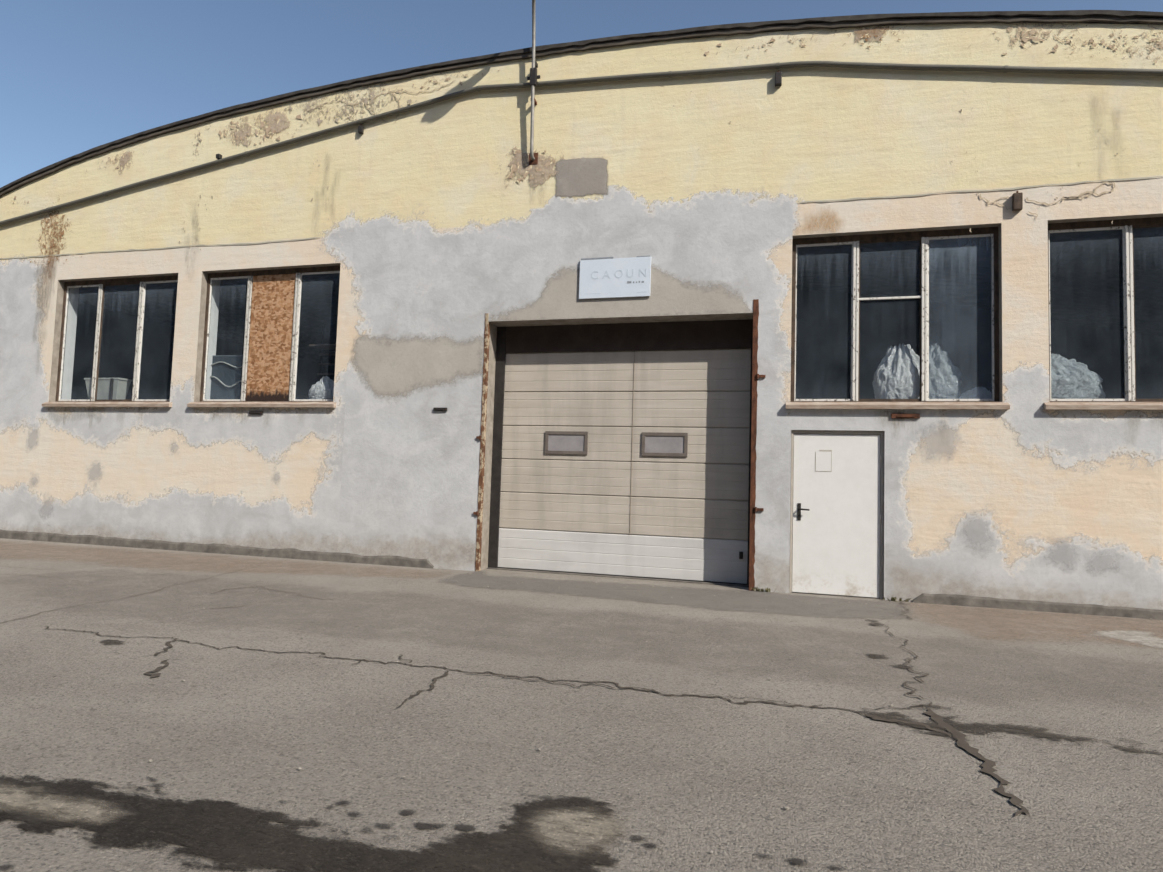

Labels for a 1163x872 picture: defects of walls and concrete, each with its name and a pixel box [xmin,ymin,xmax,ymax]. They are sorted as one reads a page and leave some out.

peeling [985,22,1163,67]
peeling [191,71,483,161]
crack [979,181,1115,219]
flaking render [0,143,1163,610]